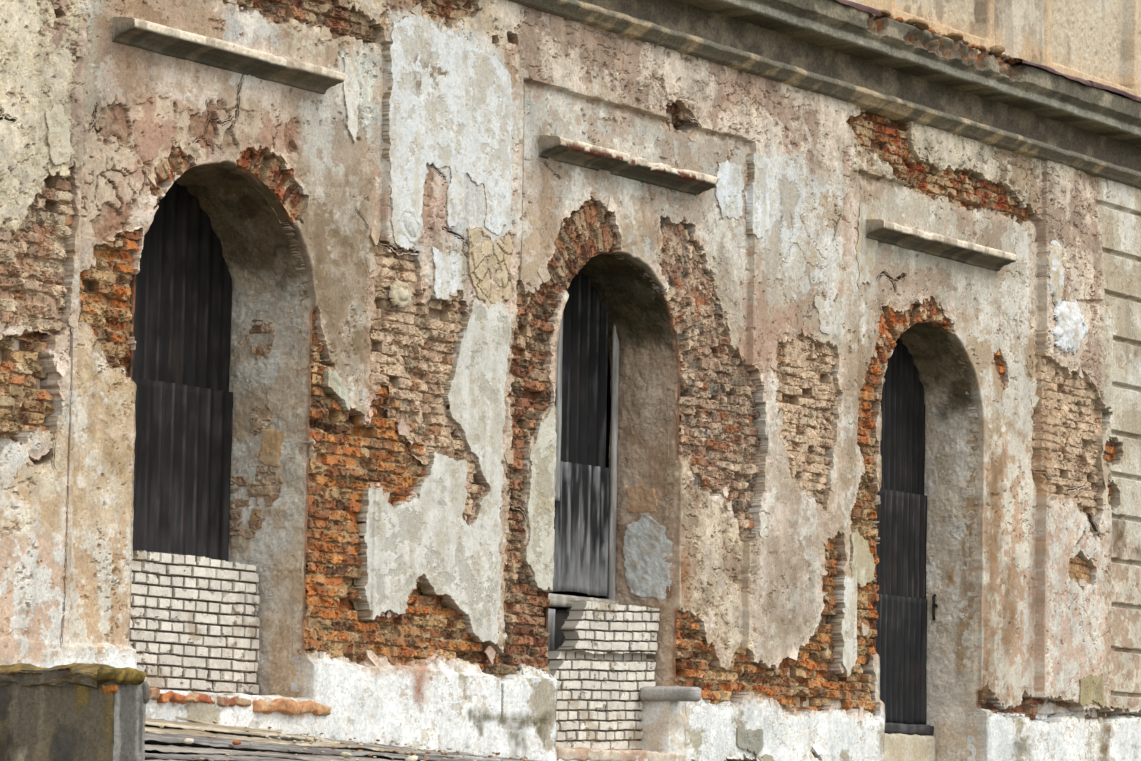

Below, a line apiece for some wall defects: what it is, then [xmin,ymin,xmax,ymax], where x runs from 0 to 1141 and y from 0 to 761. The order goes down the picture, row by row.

flaking render [146,139,190,199]
flaking render [846,112,1030,223]
flaking render [0,104,141,442]
peeling [222,0,618,685]
peeling [623,513,673,600]
flaking render [659,218,839,541]
flaking render [665,297,954,722]
flaking render [1031,350,1118,534]
peeling [727,726,775,761]